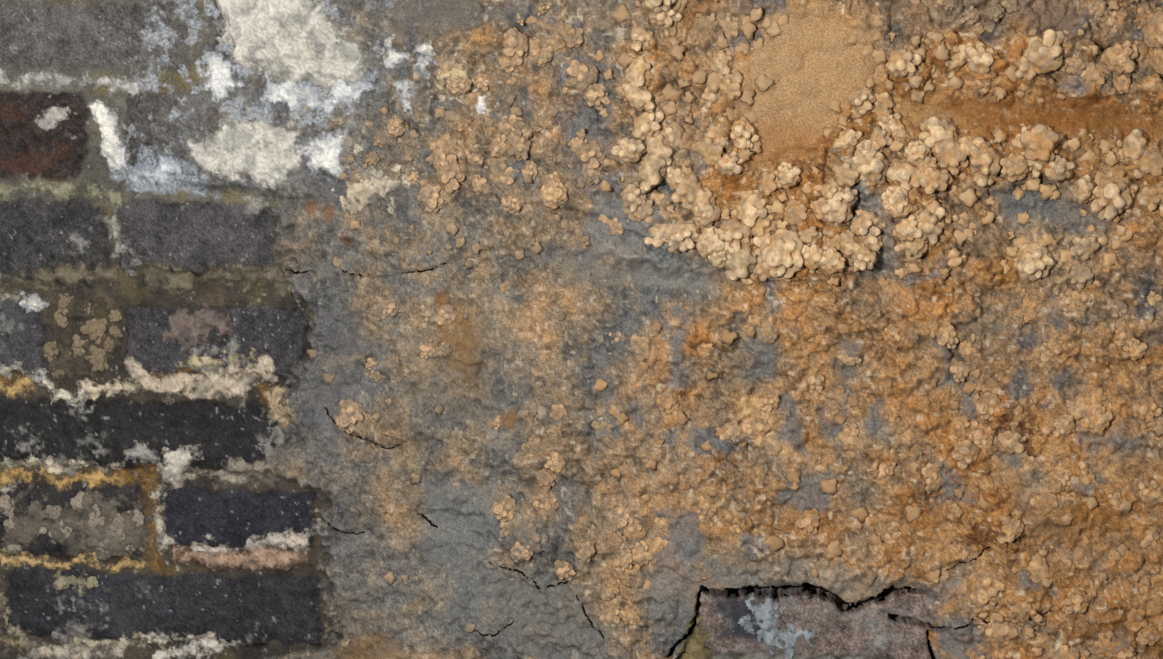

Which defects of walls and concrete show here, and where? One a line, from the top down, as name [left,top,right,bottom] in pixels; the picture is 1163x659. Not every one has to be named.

damp [141,6,177,65]
damp [186,19,202,45]
damp [383,34,410,69]
damp [393,79,415,112]
damp [35,106,70,131]
damp [89,99,207,195]
damp [186,120,346,191]
damp [343,135,363,156]
damp [340,165,400,214]
damp [391,164,412,188]
crack [946,546,990,570]
crack [670,582,990,655]